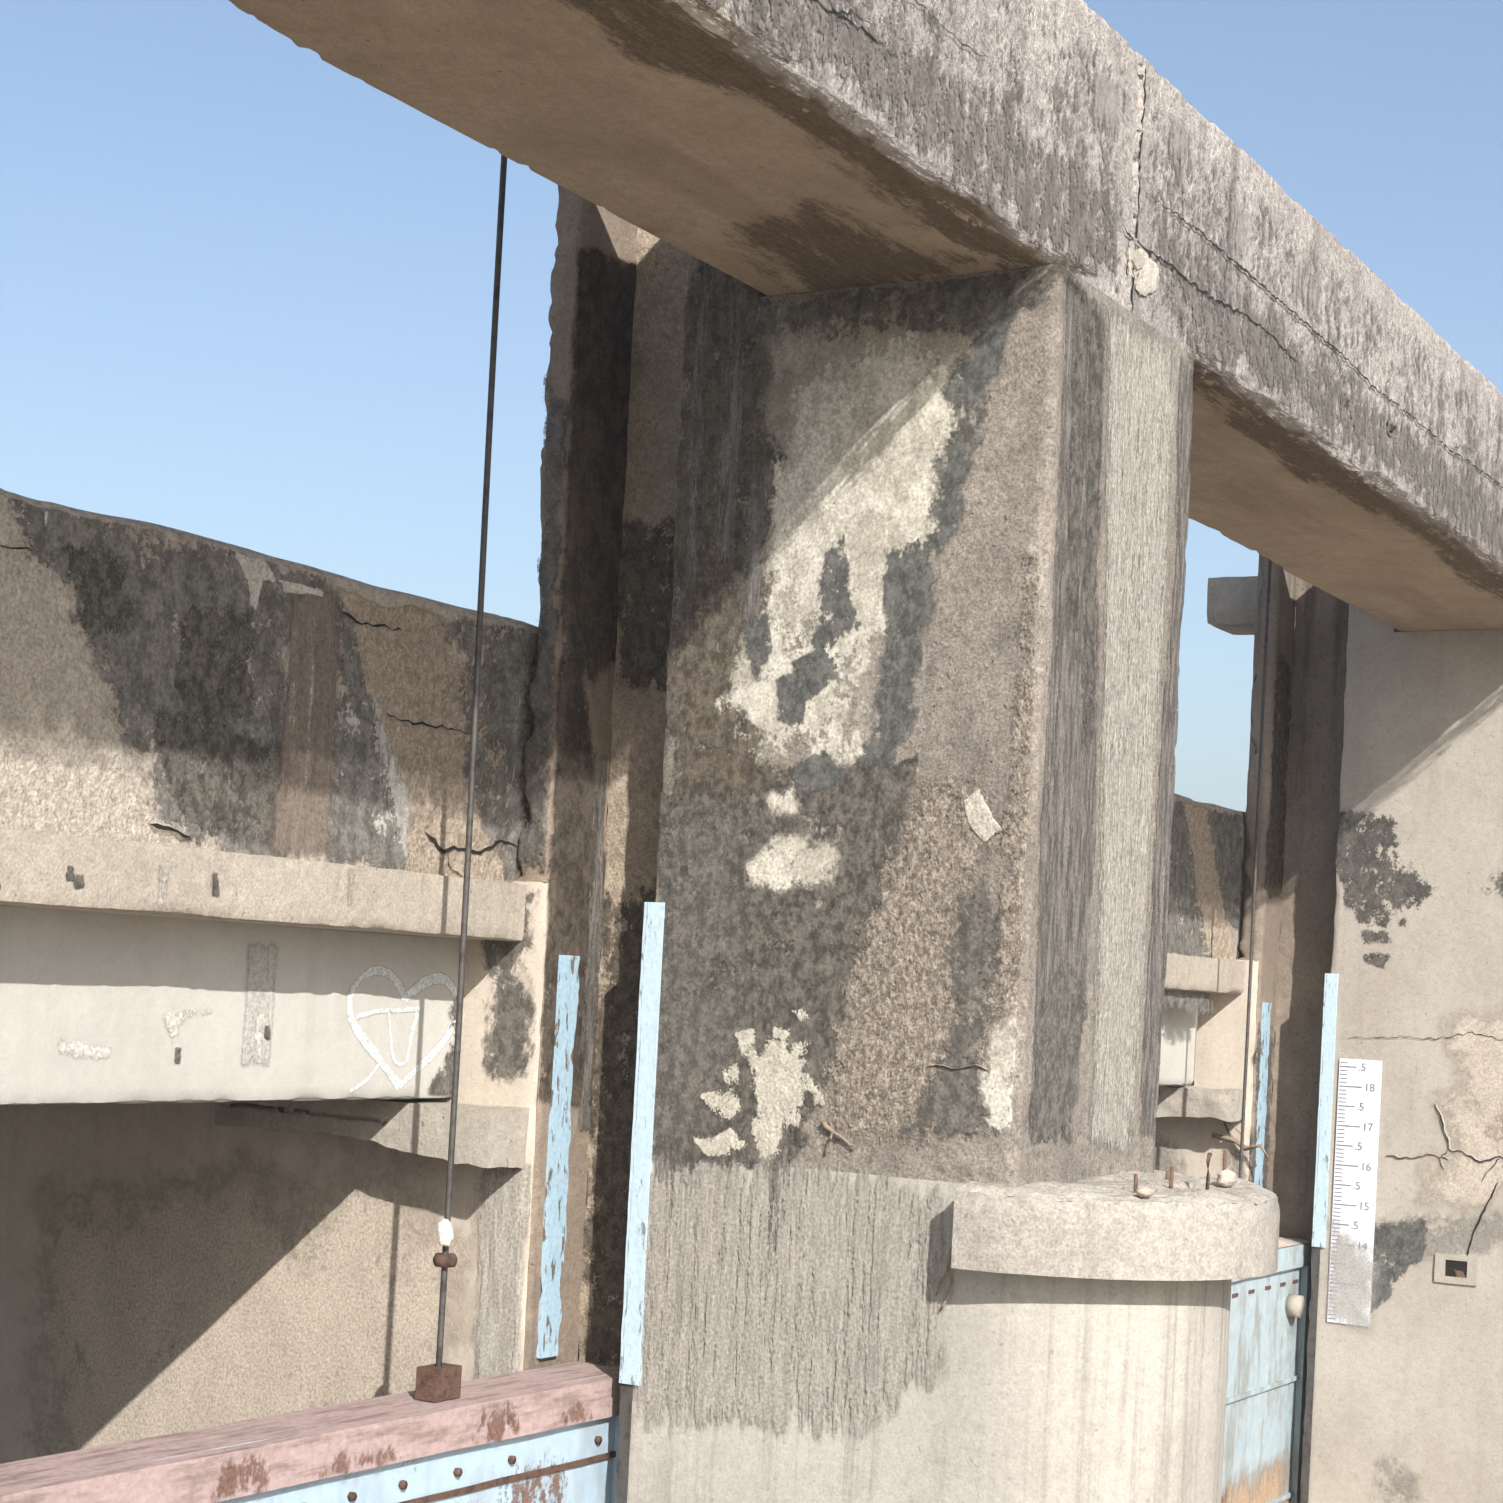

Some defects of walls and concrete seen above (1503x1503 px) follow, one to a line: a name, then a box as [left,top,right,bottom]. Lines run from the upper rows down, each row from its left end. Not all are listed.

crack [814,0,899,59]
crack [1122,55,1503,488]
water stain [563,0,1503,1189]
water stain [235,552,410,905]
crack [387,713,471,734]
water stain [66,865,85,888]
water stain [212,872,220,897]
crack [426,833,518,877]
spalling [693,550,1041,1161]
water stain [481,891,539,1080]
crack [1386,1103,1503,1256]
corrosion [499,1455,567,1503]